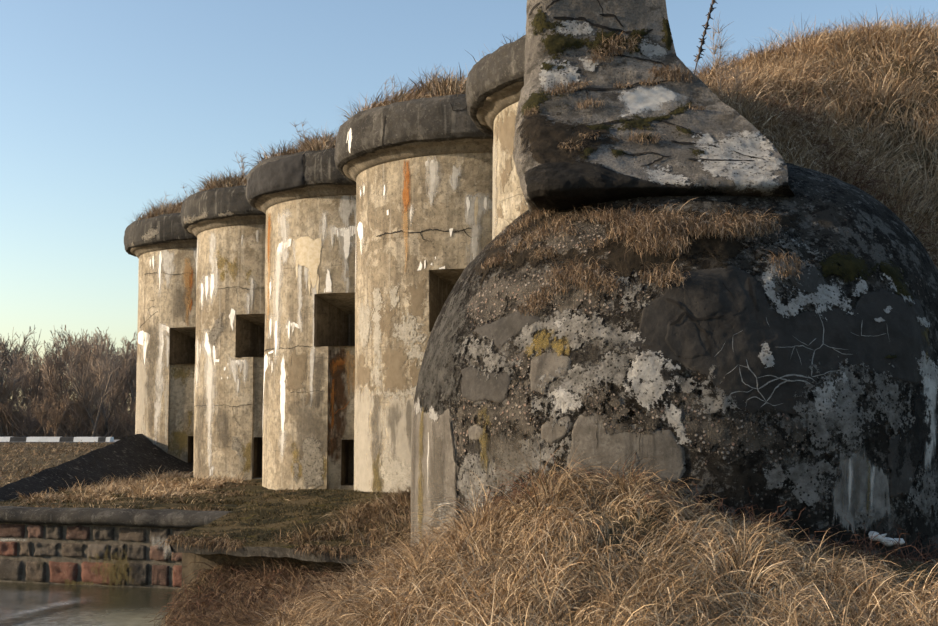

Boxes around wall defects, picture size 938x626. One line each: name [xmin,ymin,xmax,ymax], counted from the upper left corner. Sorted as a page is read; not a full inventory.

crack [528,0,672,99]
crack [595,106,758,167]
rust [402,161,412,258]
crack [376,226,481,242]
water stain [135,324,170,438]
rust [184,258,193,325]
water stain [262,186,365,455]
rust [327,348,355,461]
crack [666,277,889,410]